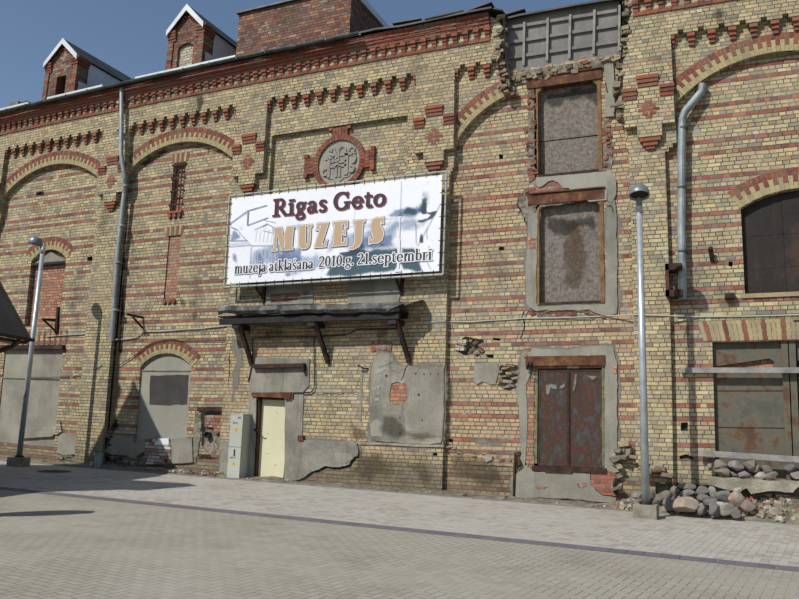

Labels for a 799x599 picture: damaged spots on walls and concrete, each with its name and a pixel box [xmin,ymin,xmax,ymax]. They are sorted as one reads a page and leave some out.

flaking render [493,0,632,320]
leakage [104,254,125,463]
flaking render [24,422,76,455]
flaking render [104,434,147,460]
spalling [164,407,222,464]
flaking render [286,436,362,481]
flaking render [367,336,674,503]